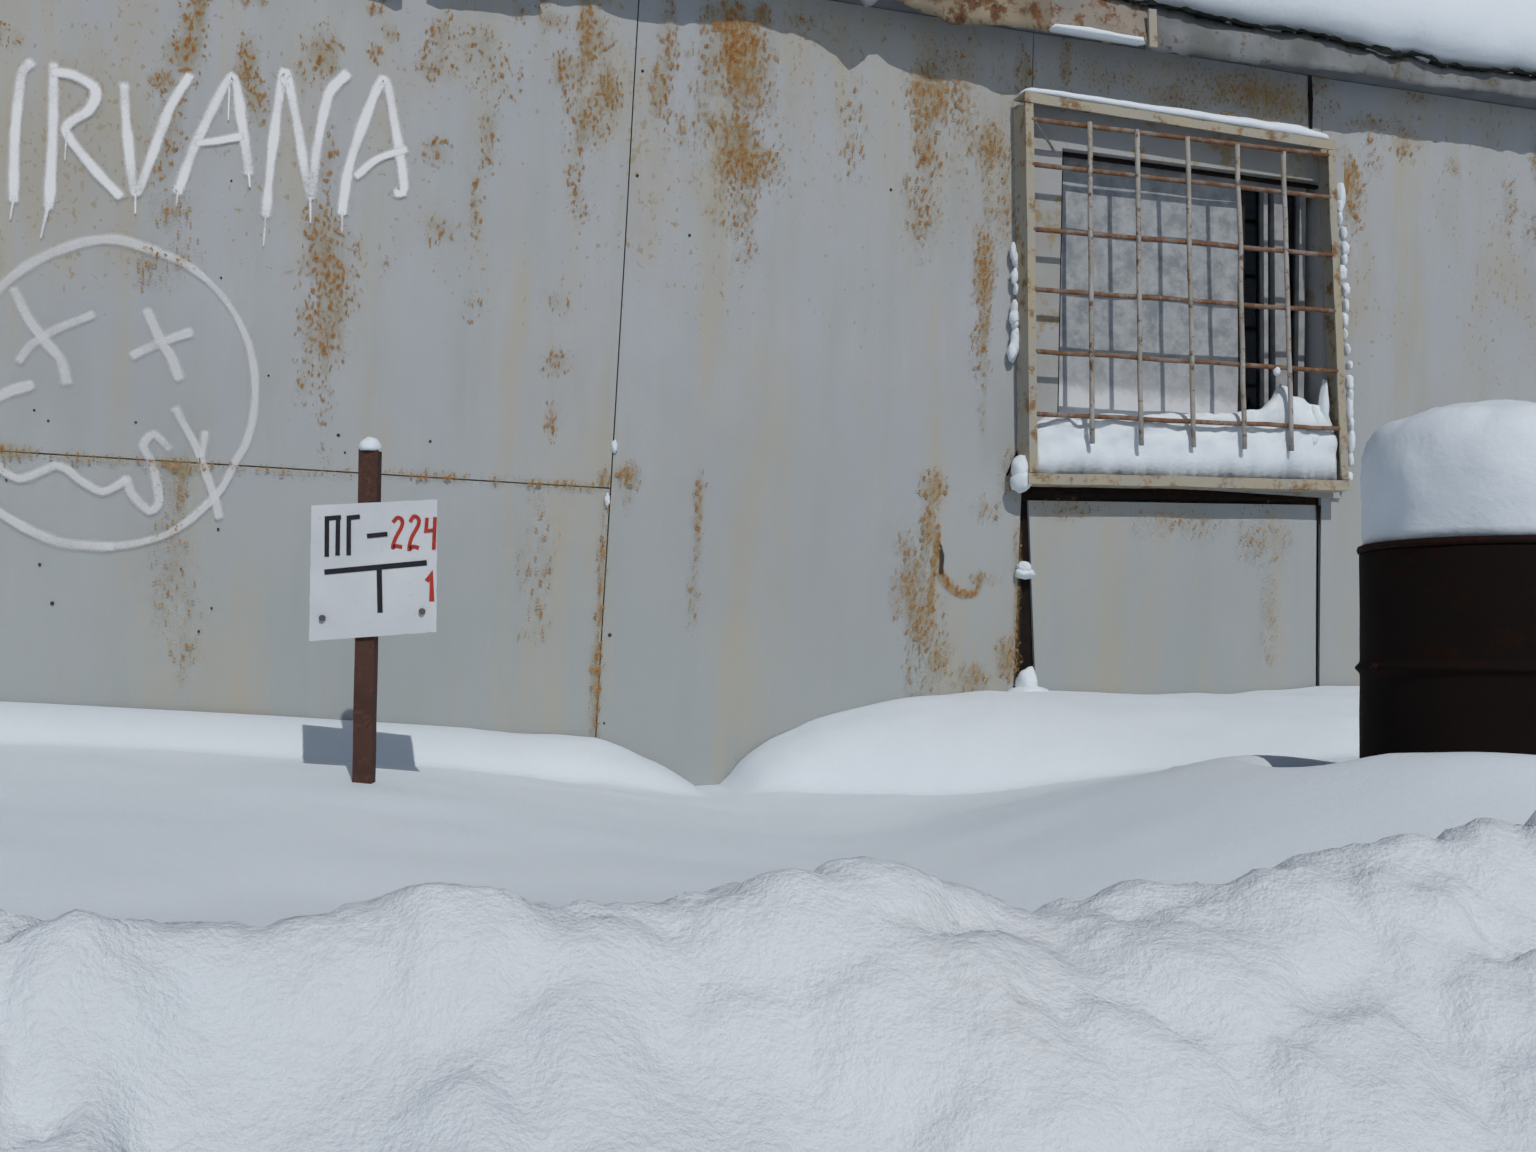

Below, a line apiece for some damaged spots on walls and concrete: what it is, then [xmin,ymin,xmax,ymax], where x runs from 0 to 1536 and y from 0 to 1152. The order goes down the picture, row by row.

rust [125,0,210,291]
rust [232,32,271,122]
rust [294,23,345,91]
rust [286,125,362,425]
rust [367,0,400,65]
rust [415,9,524,247]
rust [515,0,623,224]
rust [648,0,815,273]
rust [835,78,868,179]
rust [901,37,1015,388]
rust [1061,36,1425,255]
rust [891,449,1096,695]